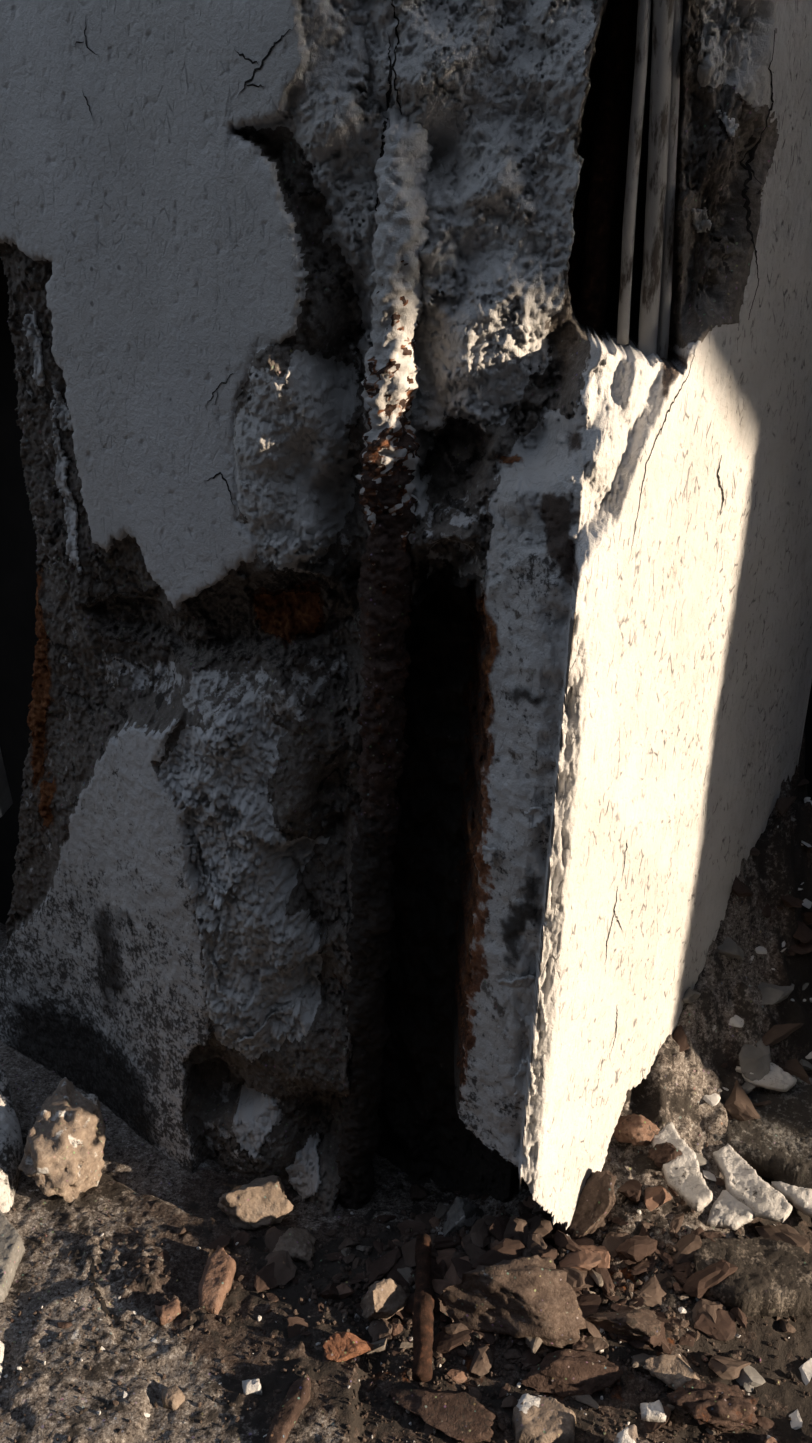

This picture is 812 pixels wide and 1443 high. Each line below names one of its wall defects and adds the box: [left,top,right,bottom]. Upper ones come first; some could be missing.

crack [234,23,297,95]
spalling [669,0,780,368]
corrosion [27,568,57,828]
spalling [0,0,653,1226]
corrosion [480,594,499,775]
spalling [742,1062,797,1092]